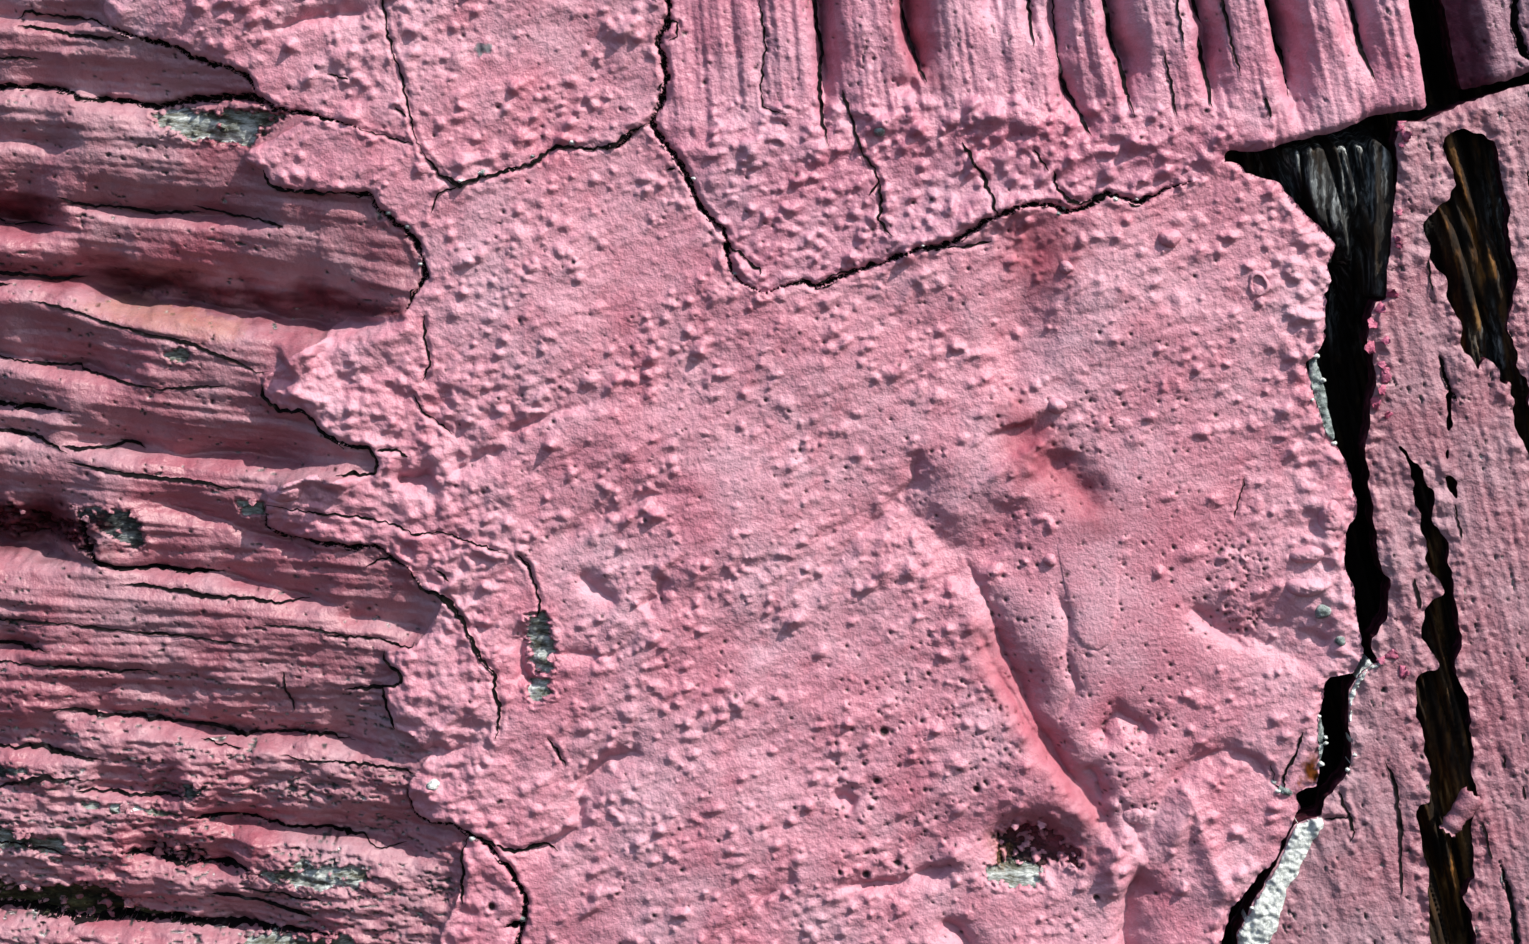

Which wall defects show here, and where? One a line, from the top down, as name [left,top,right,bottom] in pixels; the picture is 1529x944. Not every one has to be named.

peeling [151,103,285,147]
crack [0,0,1192,434]
crack [260,384,408,477]
crack [265,505,541,739]
crack [407,789,558,944]
peeling [986,821,1082,888]
peeling [1439,786,1485,838]